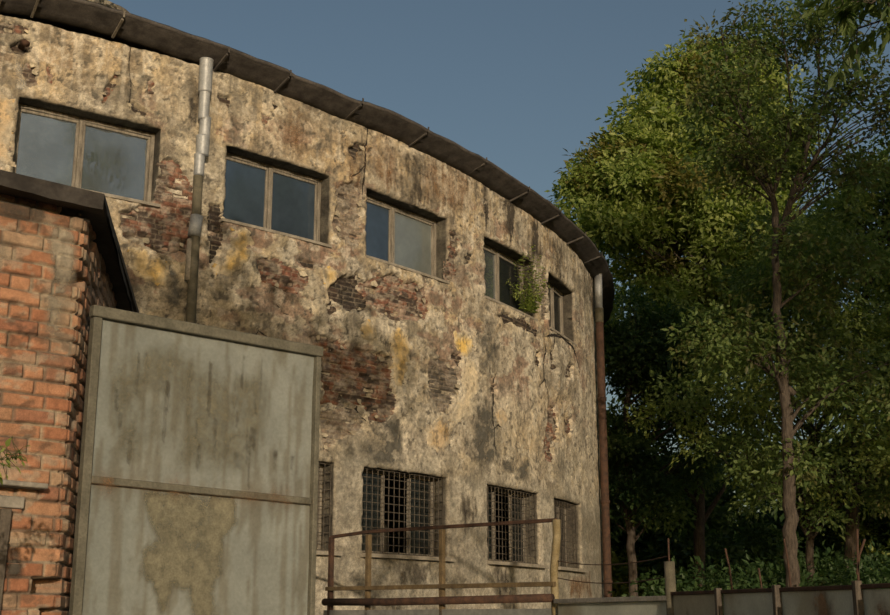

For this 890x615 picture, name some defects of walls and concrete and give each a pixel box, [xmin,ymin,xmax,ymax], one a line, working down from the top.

spalling [0,21,53,88]
peeling [0,96,16,167]
spalling [119,160,193,288]
spalling [332,182,363,251]
spalling [206,205,428,452]
spalling [425,331,483,452]
spalling [543,407,570,463]